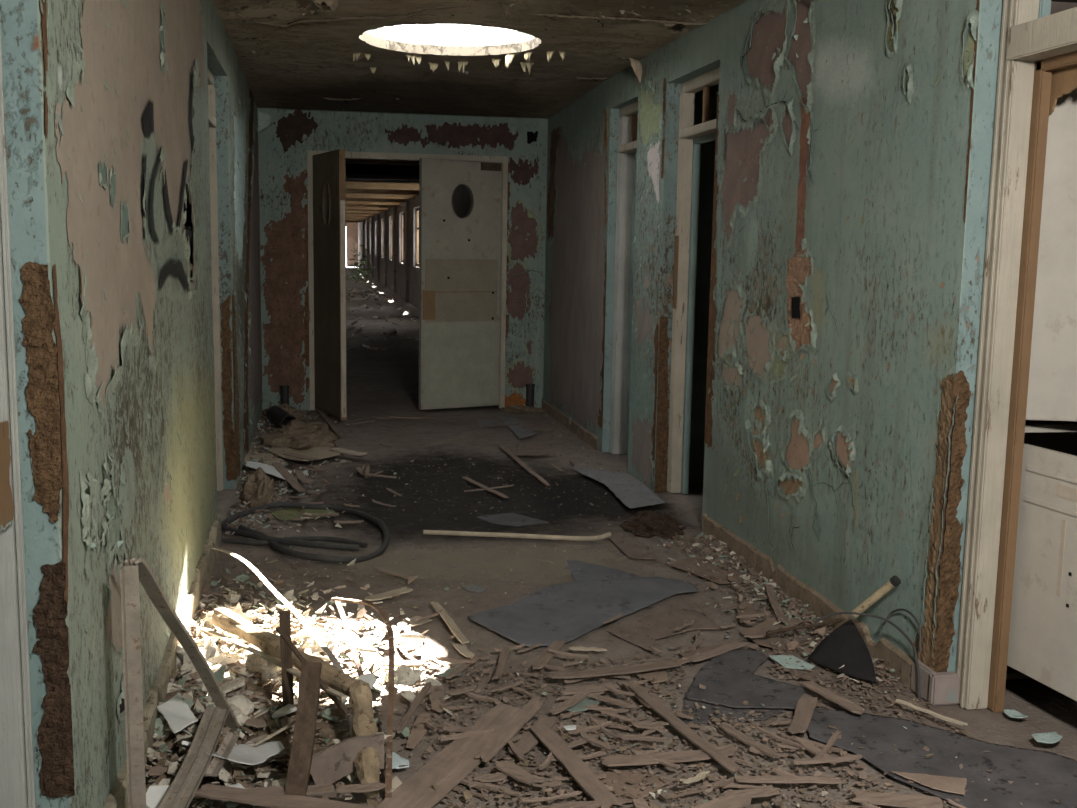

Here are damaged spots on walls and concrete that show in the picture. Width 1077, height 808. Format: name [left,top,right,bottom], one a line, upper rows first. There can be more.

peeling [224,0,349,80]
peeling [719,0,819,250]
peeling [884,0,917,104]
peeling [0,421,14,531]
flaking render [19,261,63,527]
peeling [55,0,323,654]
peeling [383,117,608,430]
peeling [619,56,665,487]
flaking render [715,238,818,394]
peeling [745,396,856,508]
flaking render [911,365,971,672]
flaking render [33,561,75,798]